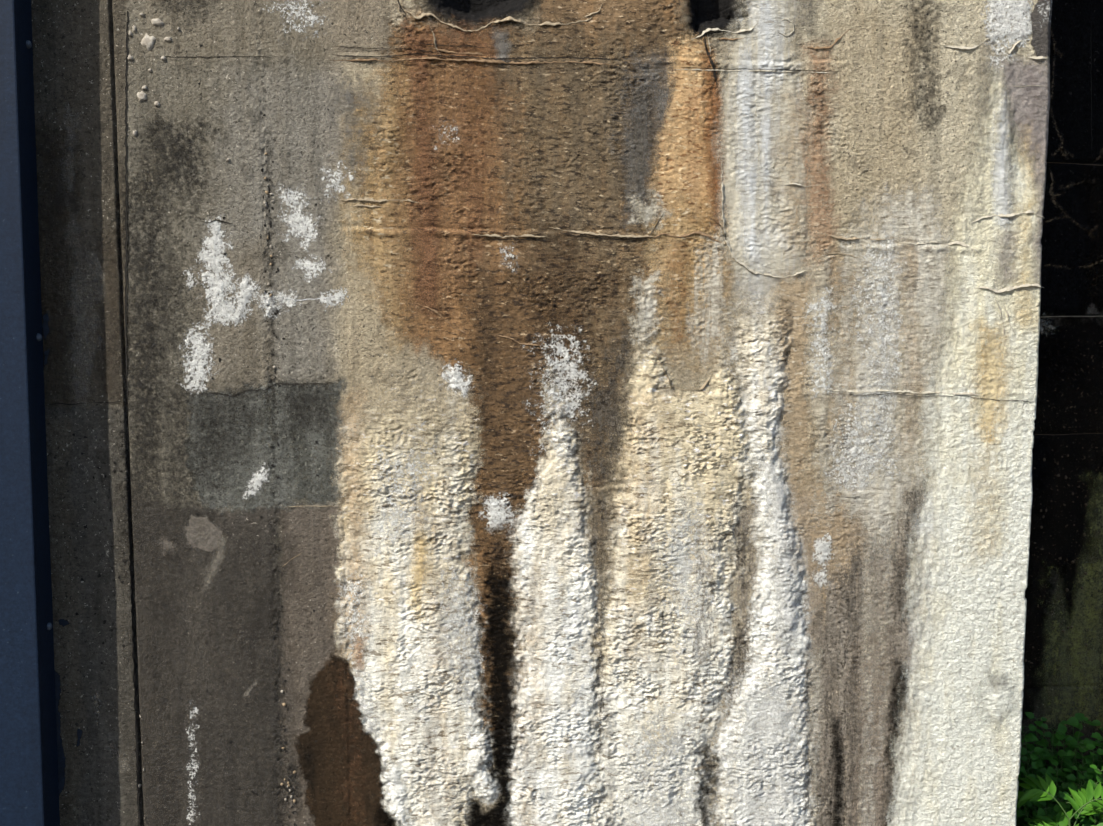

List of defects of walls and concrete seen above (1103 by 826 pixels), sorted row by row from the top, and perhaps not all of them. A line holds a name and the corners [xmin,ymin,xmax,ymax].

damp [263,0,325,34]
spalling [396,0,604,52]
spalling [685,0,758,54]
damp [145,124,198,189]
crack [1009,29,1103,269]
damp [265,133,332,282]
damp [320,288,348,308]
rust [352,0,730,734]
damp [123,182,291,826]